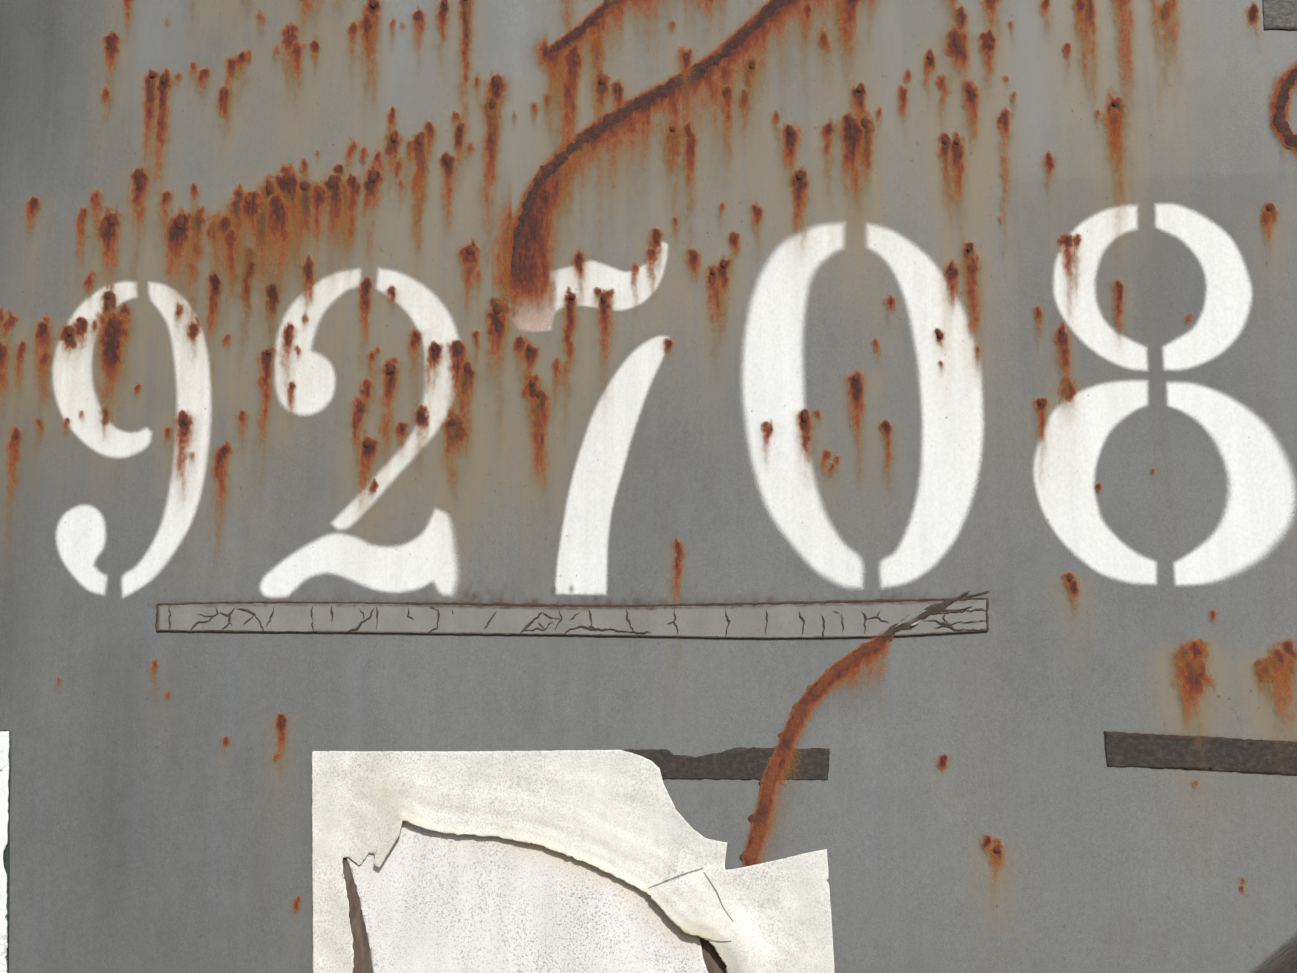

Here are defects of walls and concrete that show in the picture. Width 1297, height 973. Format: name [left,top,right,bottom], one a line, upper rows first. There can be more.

corrosion [898,0,1016,200]
corrosion [1096,0,1134,184]
corrosion [1270,62,1297,152]
corrosion [0,0,881,509]
corrosion [945,242,980,359]
corrosion [1058,234,1081,281]
corrosion [1034,306,1076,440]
crack [168,604,274,631]
crack [311,606,453,632]
crack [486,609,678,634]
corrosion [1174,639,1214,715]
corrosion [740,632,895,867]